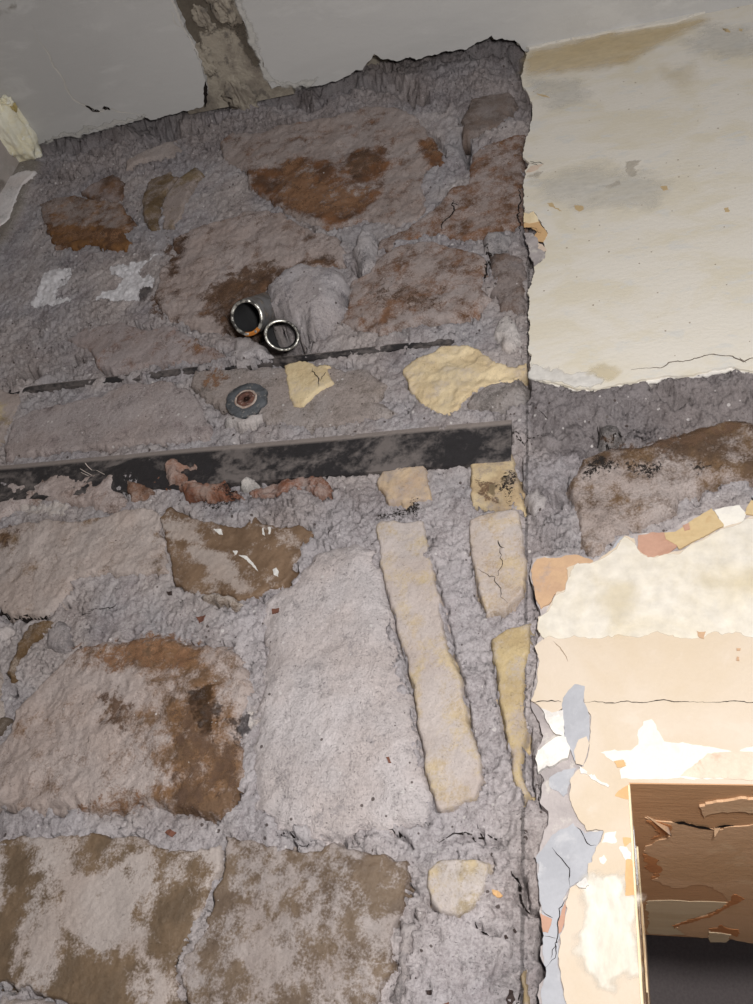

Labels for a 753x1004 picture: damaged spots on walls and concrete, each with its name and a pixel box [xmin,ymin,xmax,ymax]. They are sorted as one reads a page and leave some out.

spalling [0,27,548,500]
crack [631,354,751,370]
spalling [0,546,326,861]
spalling [120,369,753,1004]
spalling [0,981,68,1004]